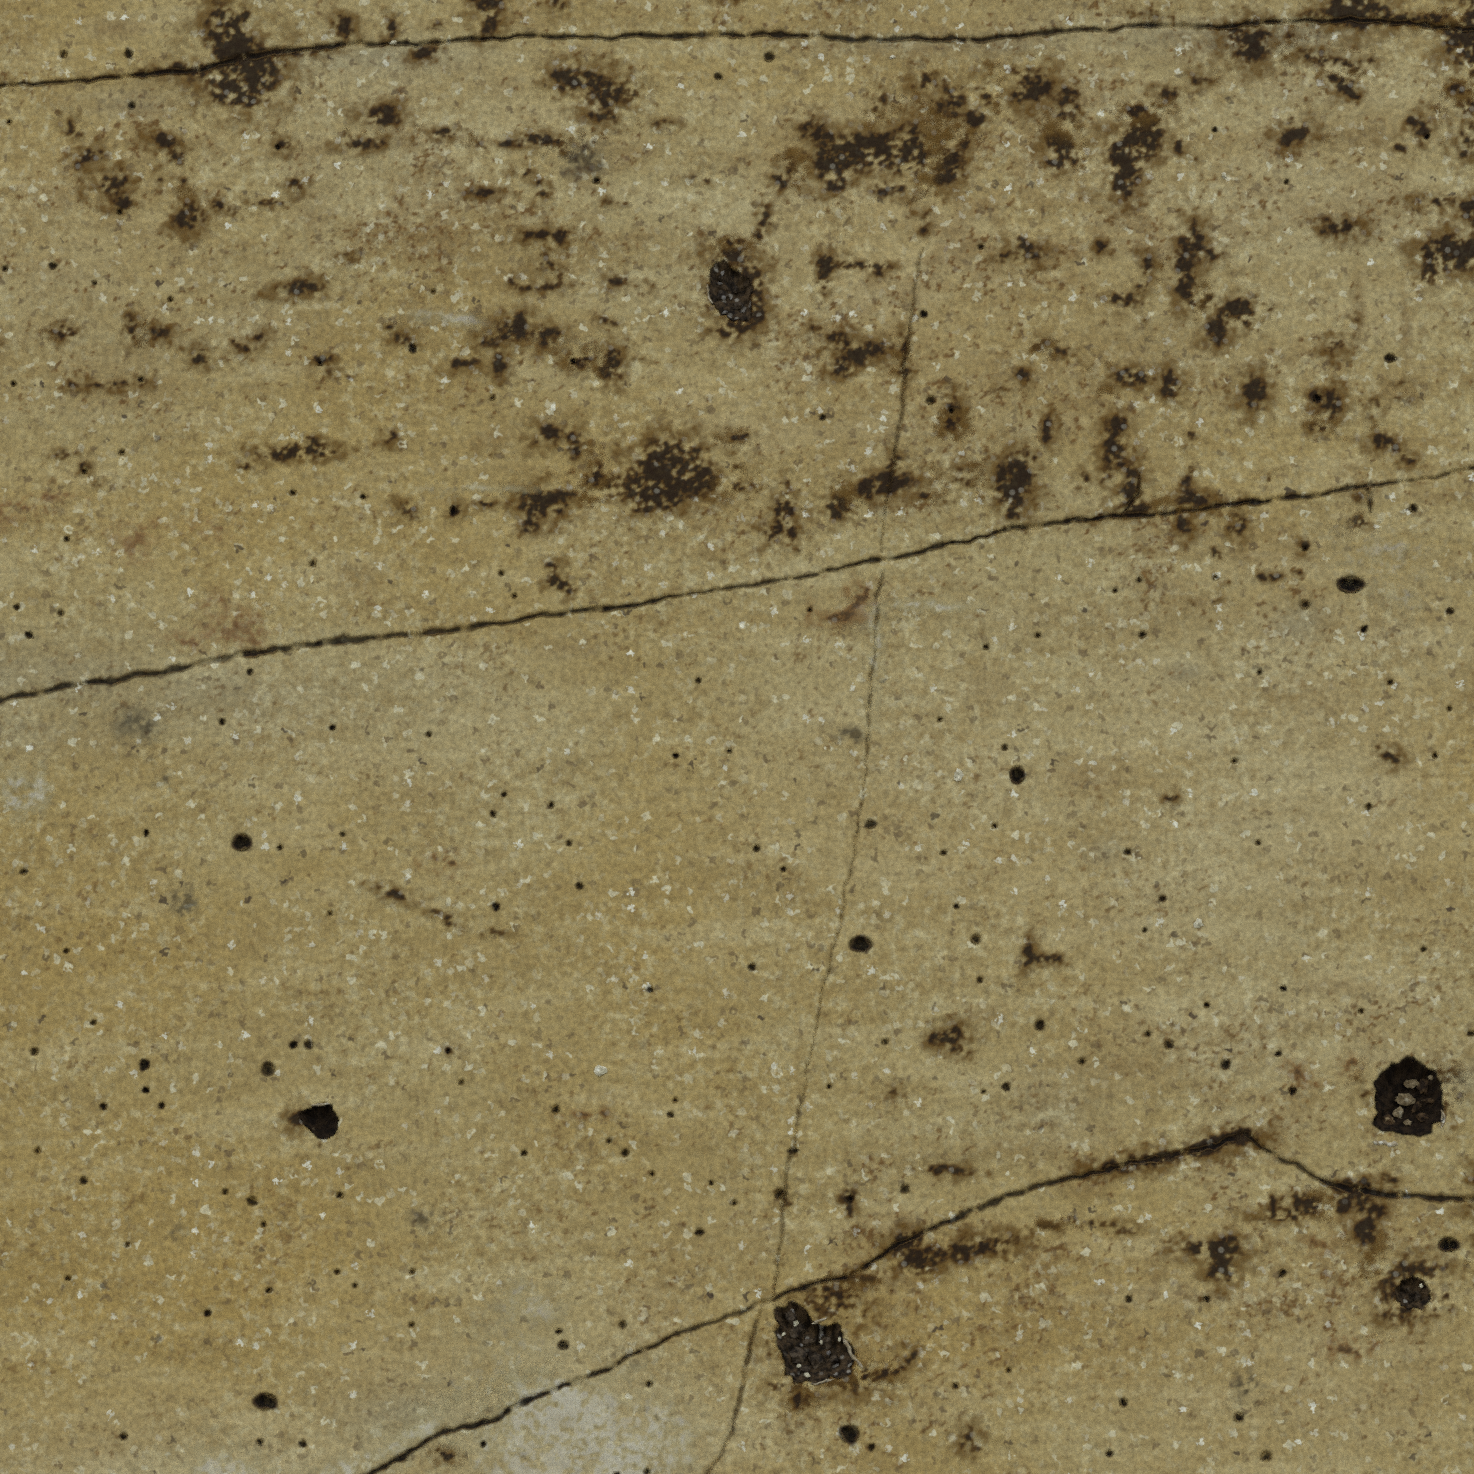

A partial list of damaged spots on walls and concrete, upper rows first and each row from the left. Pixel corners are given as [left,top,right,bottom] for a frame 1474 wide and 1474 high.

damp [107,0,358,121]
crack [0,22,1160,87]
crack [1196,16,1474,31]
damp [1215,0,1474,163]
damp [719,59,1084,246]
spalling [698,242,772,347]
damp [1102,209,1275,350]
damp [447,421,756,538]
crack [0,466,1474,704]
hole [1355,1057,1455,1147]
hole [766,1284,869,1399]
crack [367,1135,1474,1474]